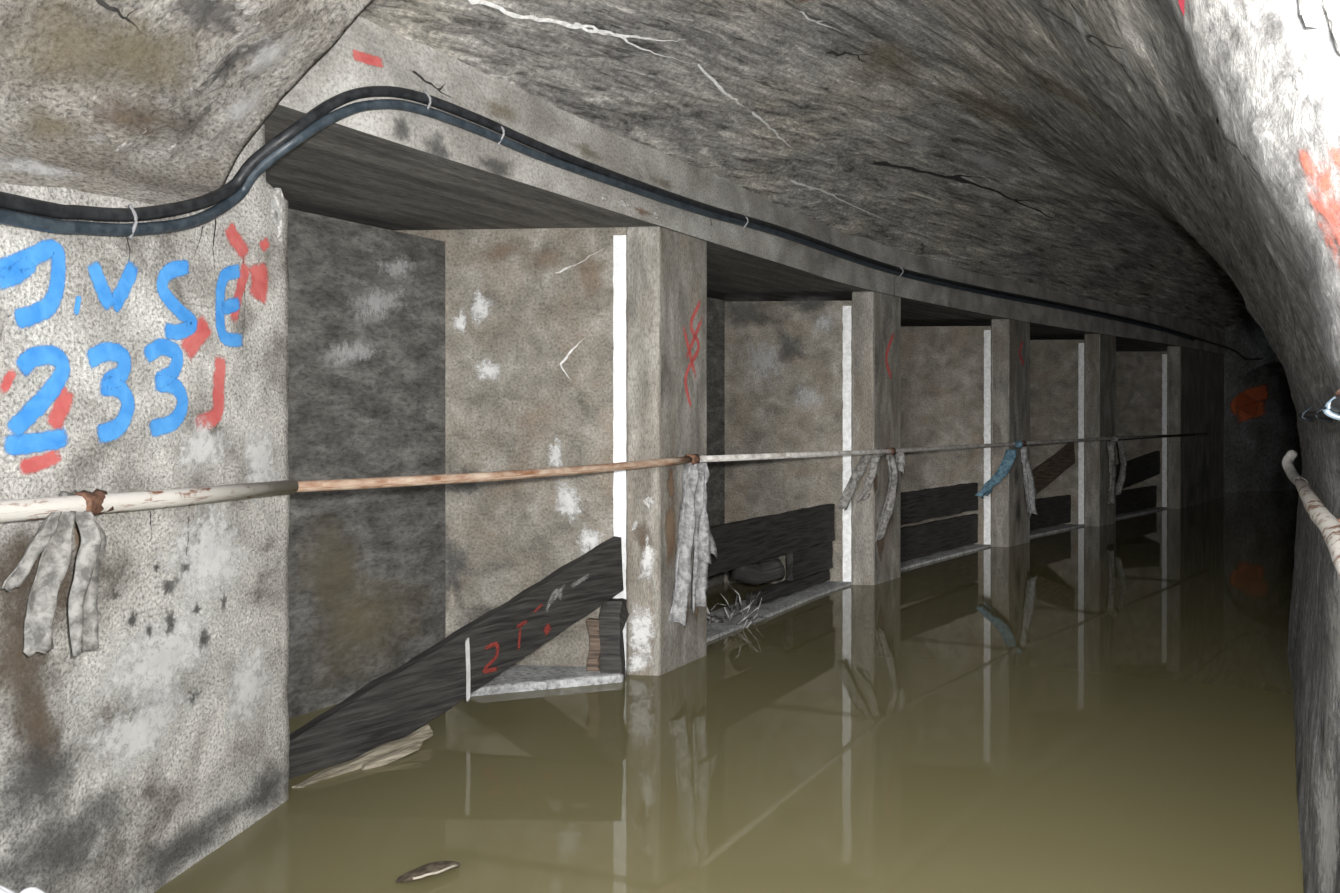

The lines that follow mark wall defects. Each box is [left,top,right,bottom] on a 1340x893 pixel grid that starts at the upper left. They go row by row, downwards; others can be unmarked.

crack [1038,4,1155,102]
spalling [1298,0,1340,63]
crack [1216,118,1278,215]